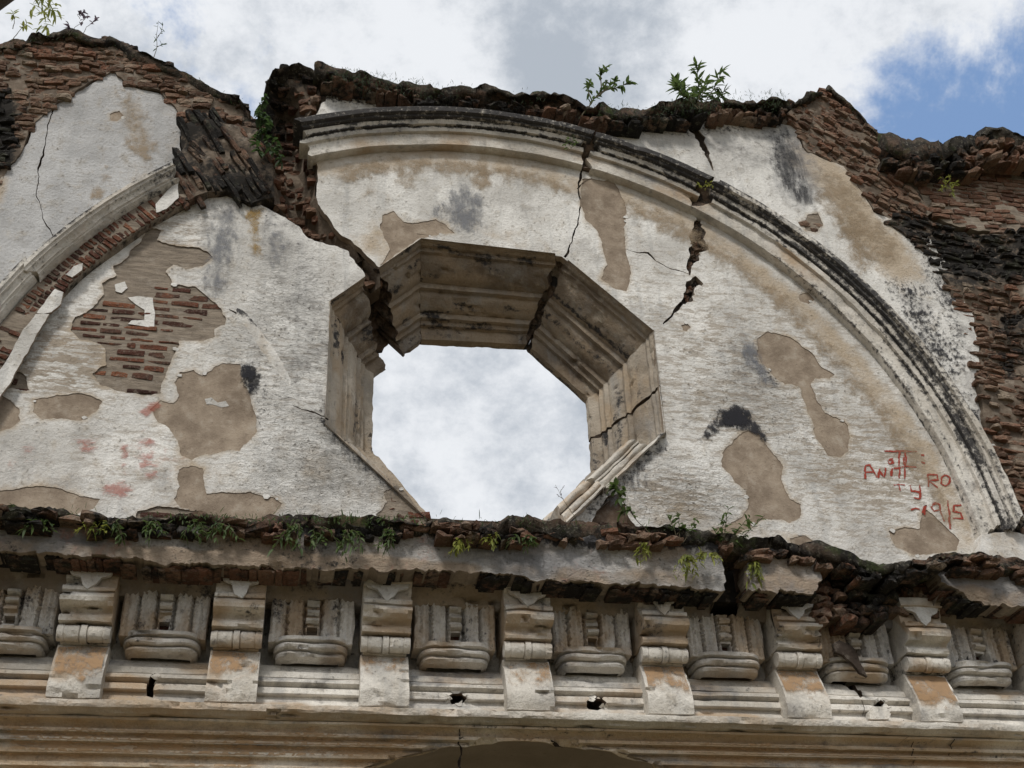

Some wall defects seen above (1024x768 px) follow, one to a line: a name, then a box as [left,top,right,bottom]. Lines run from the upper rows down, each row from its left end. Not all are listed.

crack [36,111,53,236]
crack [261,64,388,353]
damp [342,159,566,231]
crack [523,136,598,353]
spalling [579,179,631,291]
crack [632,131,713,324]
damp [772,137,894,268]
spalling [0,372,102,431]
flaking render [71,229,281,522]
damp [241,364,259,396]
damp [703,404,767,442]
spalling [711,431,801,535]